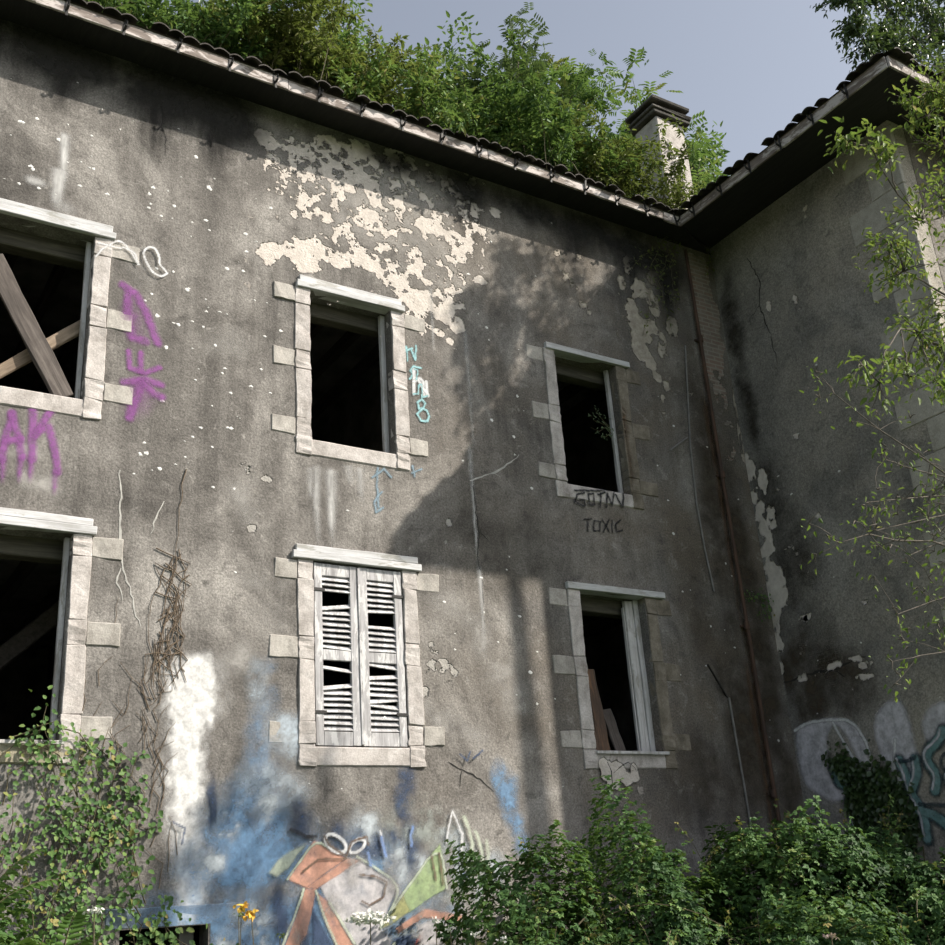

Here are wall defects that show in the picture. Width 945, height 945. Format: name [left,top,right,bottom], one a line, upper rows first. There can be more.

peeling [242,125,502,349]
peeling [617,258,679,415]
leakage [722,301,743,360]
crack [747,258,777,360]
leakage [736,379,758,439]
peeling [688,252,812,675]
leakage [764,466,782,520]
peeling [797,642,874,690]
leakage [165,654,216,925]
spalling [598,755,643,794]